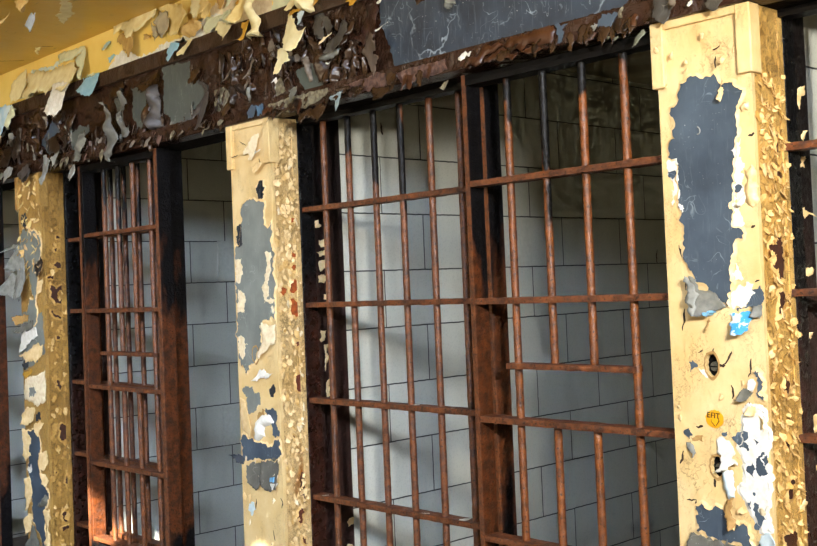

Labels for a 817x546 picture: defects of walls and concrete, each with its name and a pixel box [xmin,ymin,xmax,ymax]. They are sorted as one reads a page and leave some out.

peeling [0,0,646,546]
peeling [666,46,814,546]